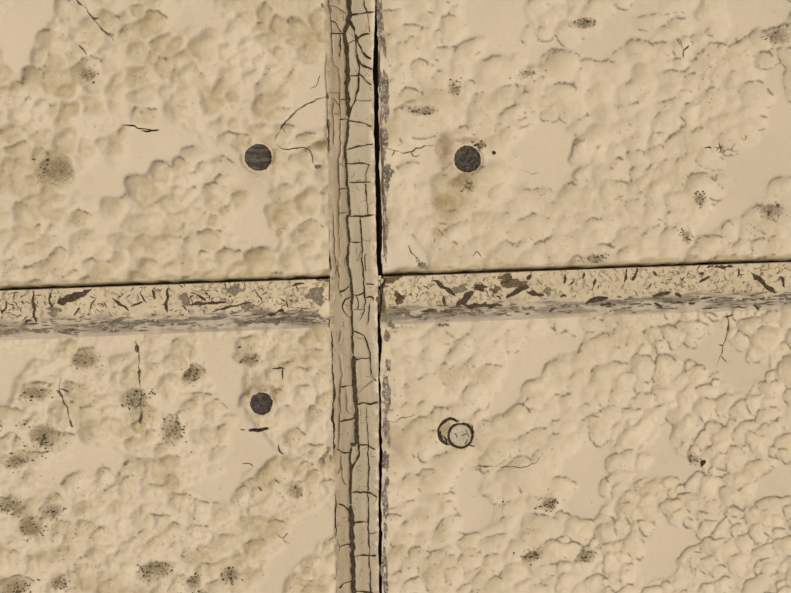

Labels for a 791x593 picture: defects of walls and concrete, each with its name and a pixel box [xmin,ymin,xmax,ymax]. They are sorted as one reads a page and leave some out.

peeling [0,291,70,335]
spalling [112,288,169,312]
peeling [179,282,262,312]
peeling [292,278,336,319]
crack [275,0,433,593]
peeling [376,276,437,342]
peeling [432,273,574,314]
spalling [563,272,612,306]
spalling [753,273,785,294]
water stain [3,421,53,478]
crack [437,417,474,449]
crack [476,456,541,468]